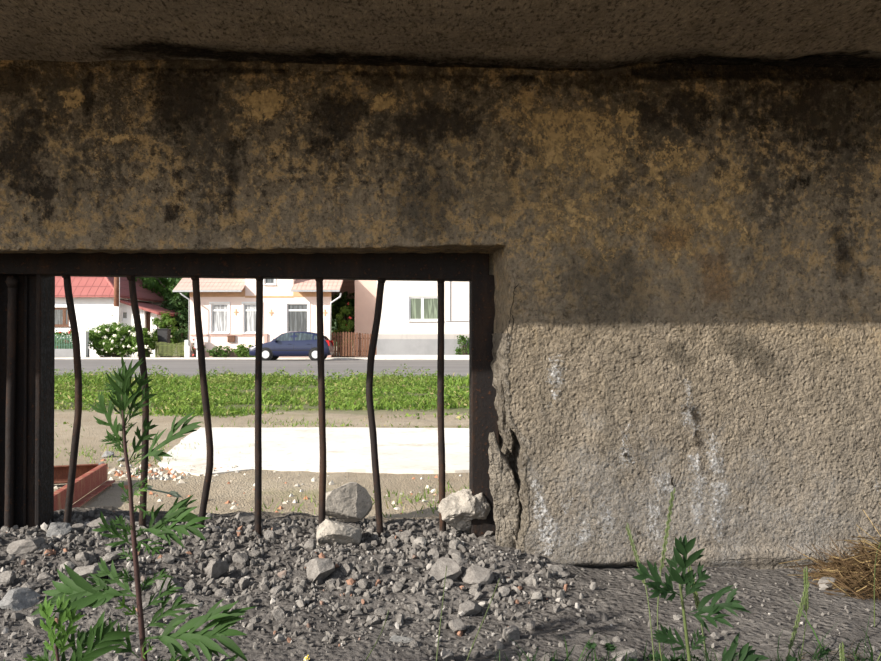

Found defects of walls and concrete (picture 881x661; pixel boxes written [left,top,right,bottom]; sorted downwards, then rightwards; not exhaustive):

leakage [0,109,59,228]
leakage [83,71,96,120]
leakage [148,69,219,223]
leakage [225,140,243,207]
leakage [303,86,371,162]
crack [107,43,586,80]
leakage [348,52,881,156]
crack [631,51,881,82]
leakage [681,381,729,542]